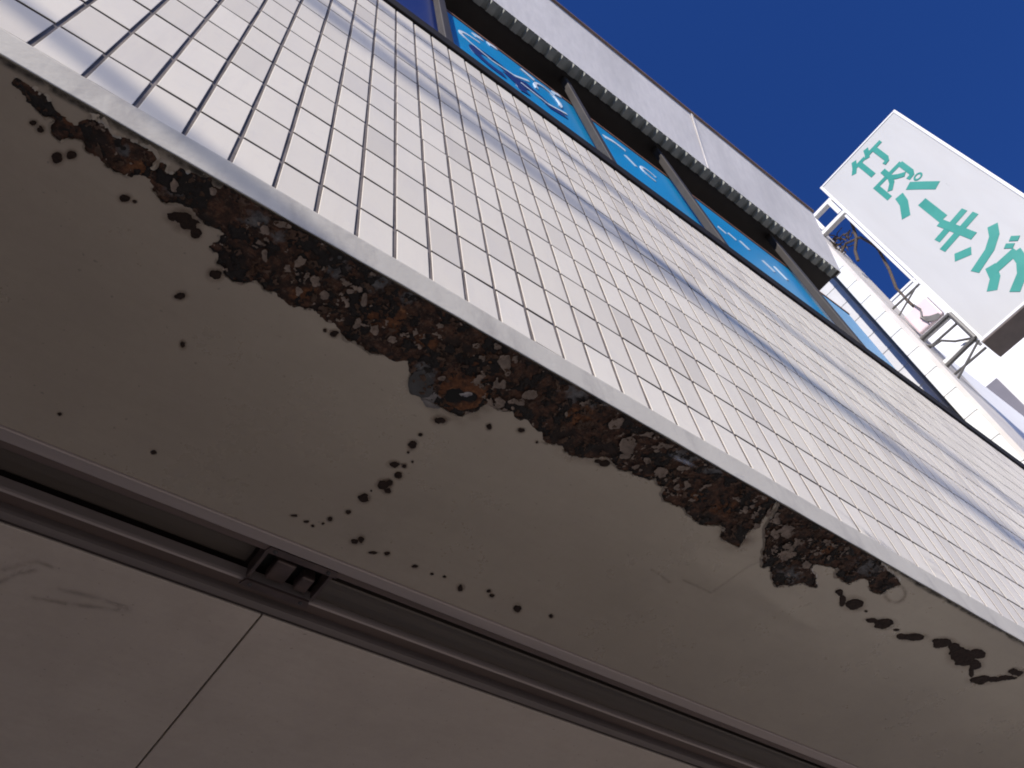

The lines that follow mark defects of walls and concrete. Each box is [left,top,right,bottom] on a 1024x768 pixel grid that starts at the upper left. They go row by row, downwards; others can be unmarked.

rust [11,75,901,595]